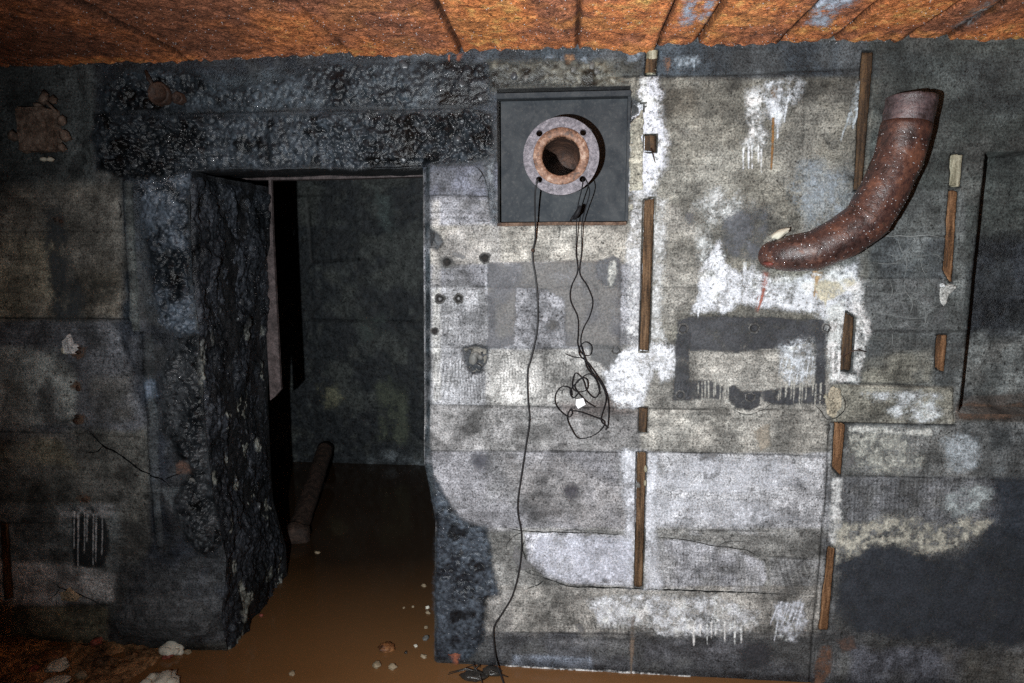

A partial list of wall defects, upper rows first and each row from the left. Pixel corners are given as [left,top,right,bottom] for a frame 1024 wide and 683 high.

damp [742,81,800,169]
damp [589,77,676,408]
damp [693,187,871,385]
crack [86,431,183,489]
crack [500,526,815,609]
damp [535,449,807,667]
damp [829,478,1024,646]